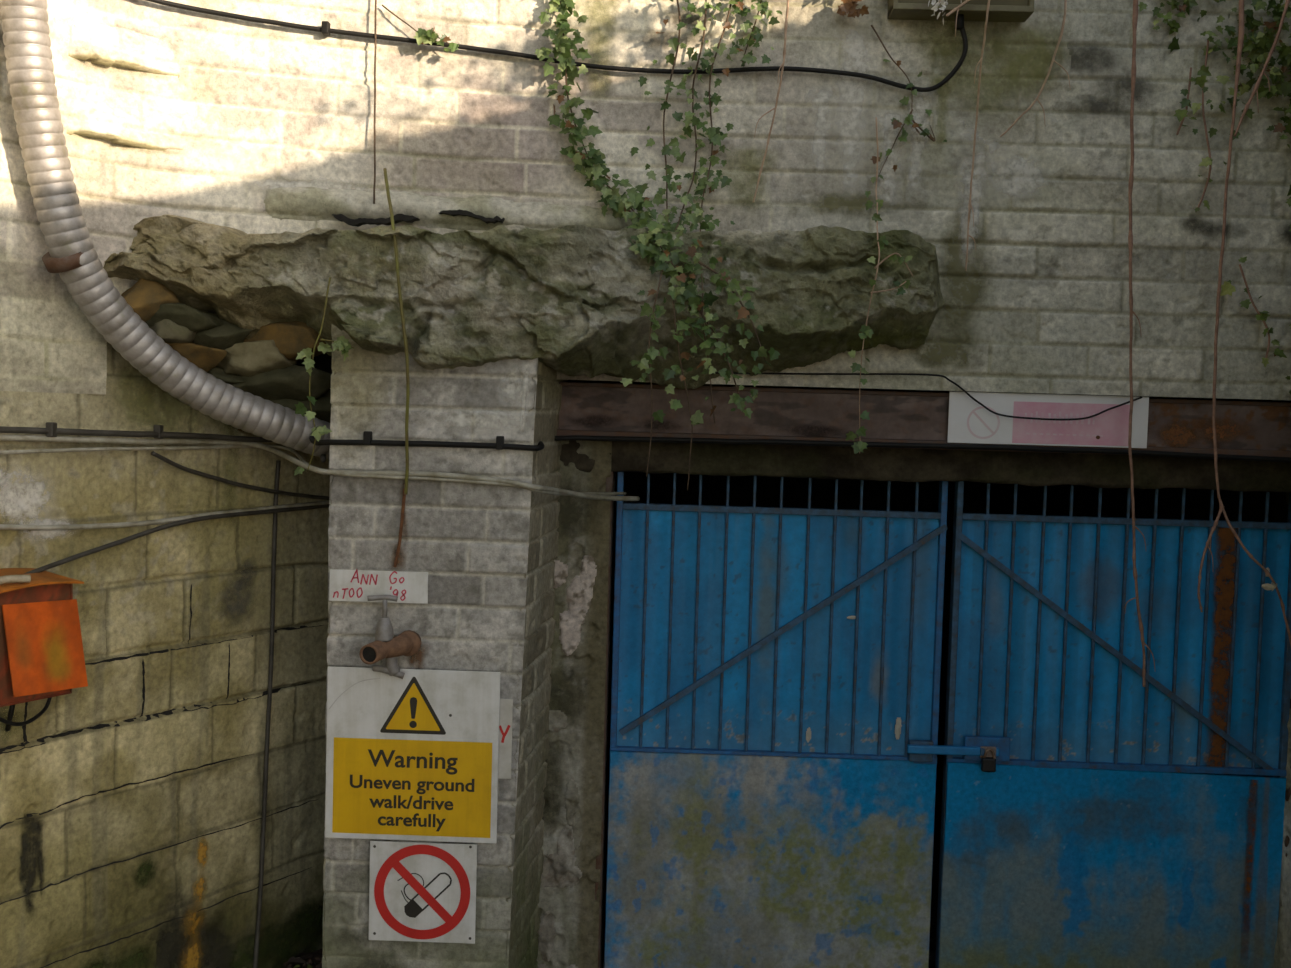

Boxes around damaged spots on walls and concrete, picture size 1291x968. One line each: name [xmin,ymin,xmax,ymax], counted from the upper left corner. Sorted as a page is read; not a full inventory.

peeling [554,555,597,656]
leakage [20,818,44,912]
peeling [541,777,582,888]
leakage [156,896,323,968]